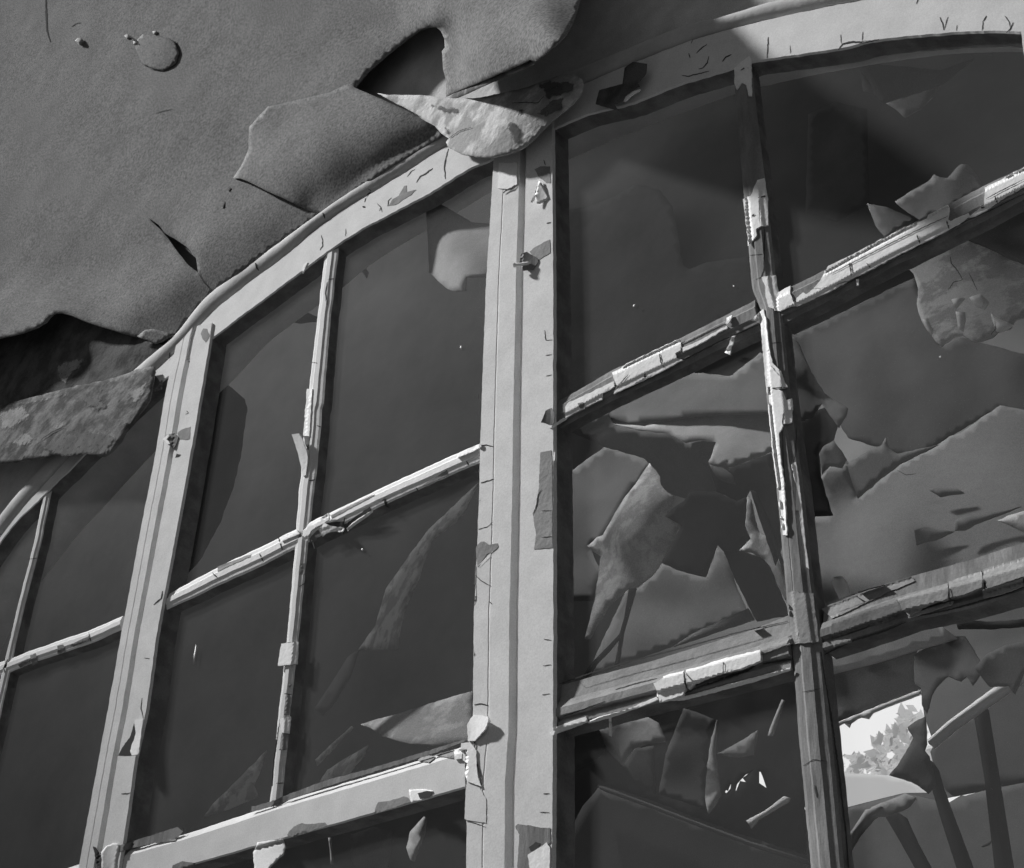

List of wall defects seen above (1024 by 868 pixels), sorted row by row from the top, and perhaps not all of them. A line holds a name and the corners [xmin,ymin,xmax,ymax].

peeling [0,0,584,477]
peeling [533,450,556,549]
peeling [541,164,1024,855]